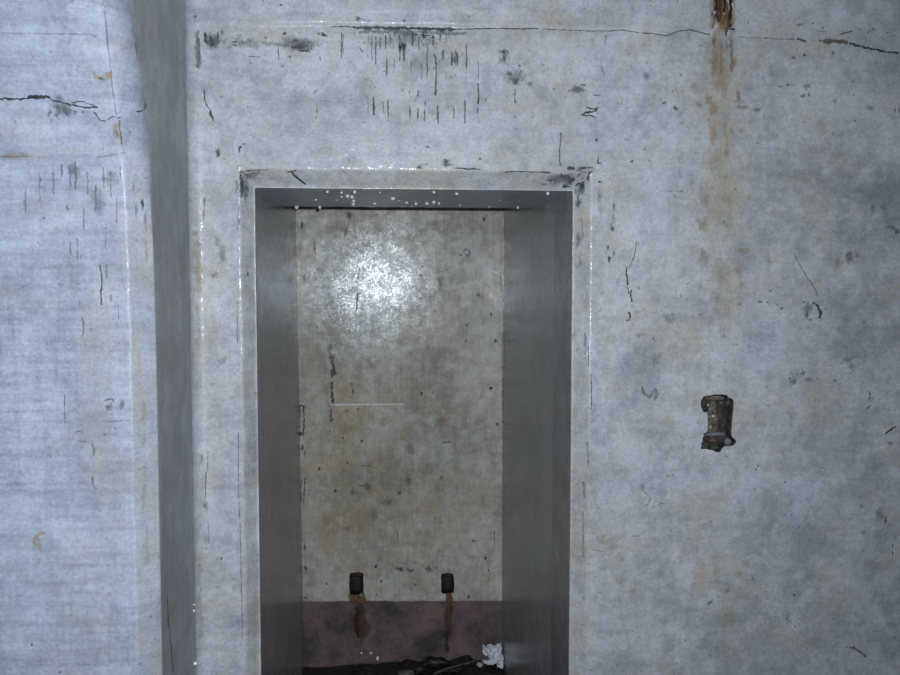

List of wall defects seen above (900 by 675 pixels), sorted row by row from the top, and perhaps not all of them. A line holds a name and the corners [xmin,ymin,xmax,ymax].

crack [332,25,538,33]
crack [644,28,709,36]
rust [710,0,735,35]
crack [746,31,898,54]
crack [0,95,115,122]